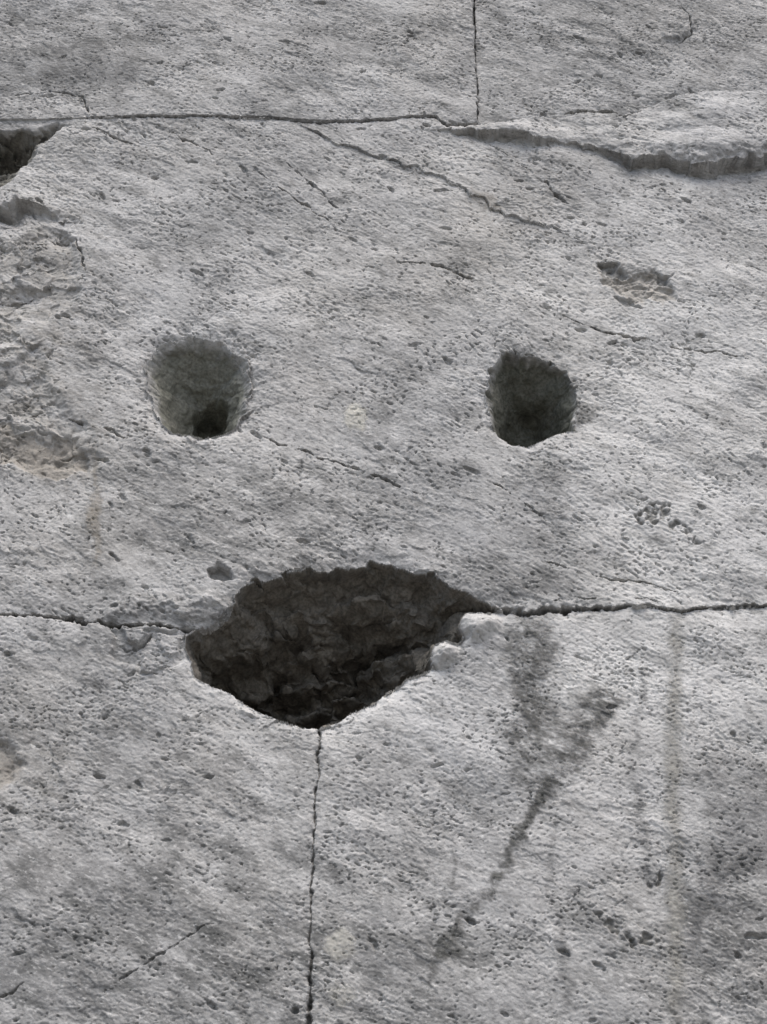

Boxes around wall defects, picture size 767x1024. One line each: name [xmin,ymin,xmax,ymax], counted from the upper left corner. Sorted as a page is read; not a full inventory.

crack [10,0,587,248]
crack [544,107,647,119]
crack [0,612,195,635]
spalling [108,559,506,730]
crack [305,729,323,1024]
damp [490,777,557,896]
damp [430,904,478,975]